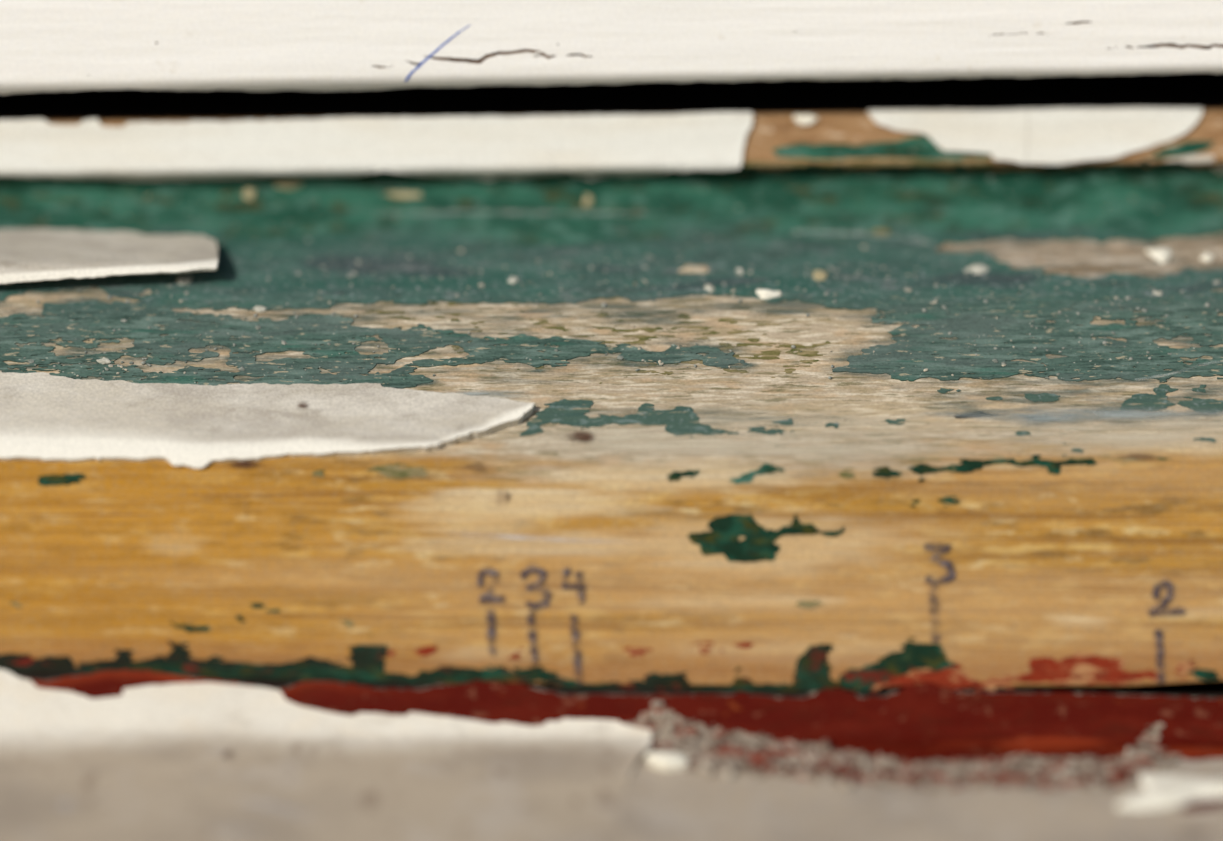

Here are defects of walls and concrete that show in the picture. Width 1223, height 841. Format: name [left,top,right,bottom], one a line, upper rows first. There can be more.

crack [372,49,592,68]
crack [993,21,1091,35]
crack [1106,42,1223,50]
peeling [741,114,1000,171]
peeling [1128,111,1223,166]
peeling [243,188,255,200]
peeling [386,191,422,199]
peeling [0,228,218,318]
peeling [935,235,1223,296]
peeling [0,264,895,469]
peeling [1153,334,1213,361]
peeling [0,669,689,841]